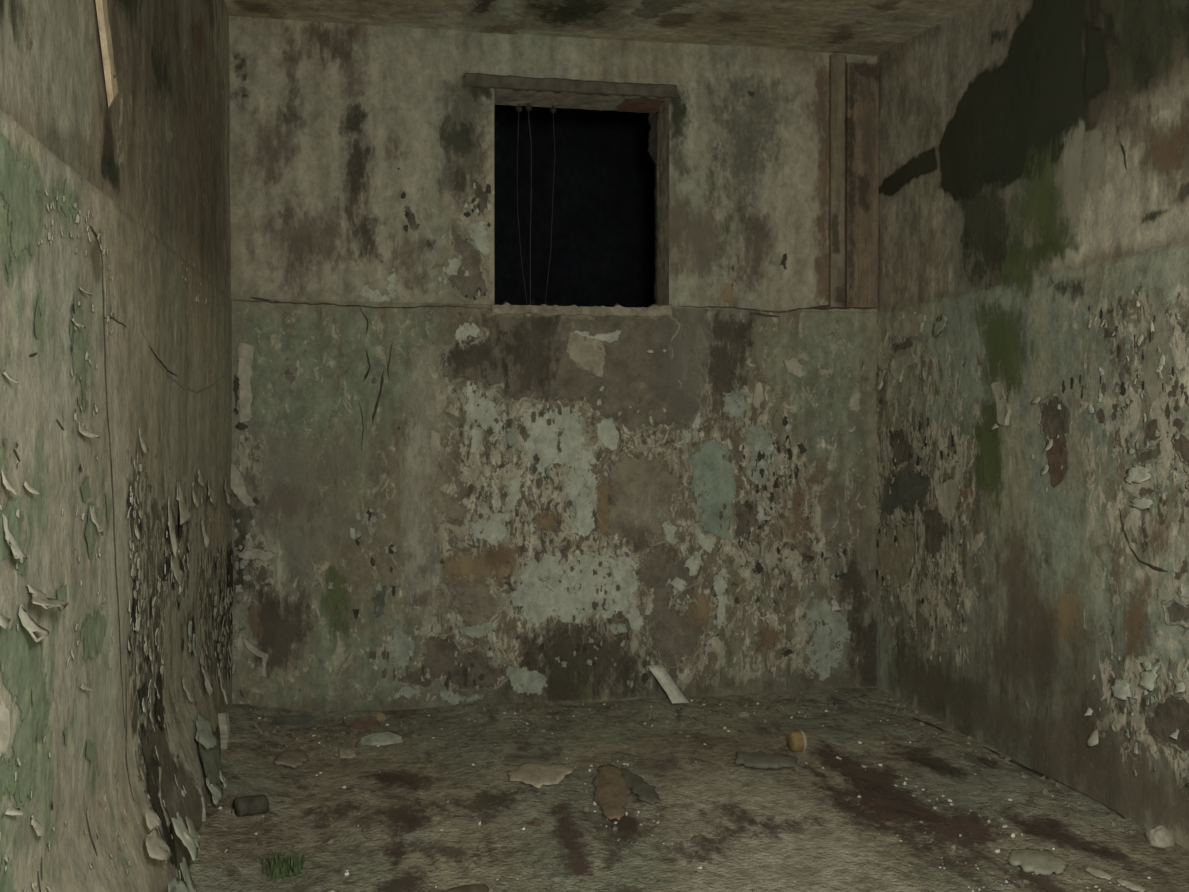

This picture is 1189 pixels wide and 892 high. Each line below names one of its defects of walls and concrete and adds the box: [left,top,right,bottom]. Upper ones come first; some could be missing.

damp [532,0,613,31]
damp [268,52,376,288]
damp [440,75,491,199]
spalling [437,175,495,303]
damp [879,0,1189,290]
peeling [69,287,99,442]
spalling [322,312,851,706]
damp [975,303,1024,508]
peeling [1030,287,1189,629]
peeling [0,426,83,892]
spalling [127,428,276,881]
spalling [1084,659,1189,786]